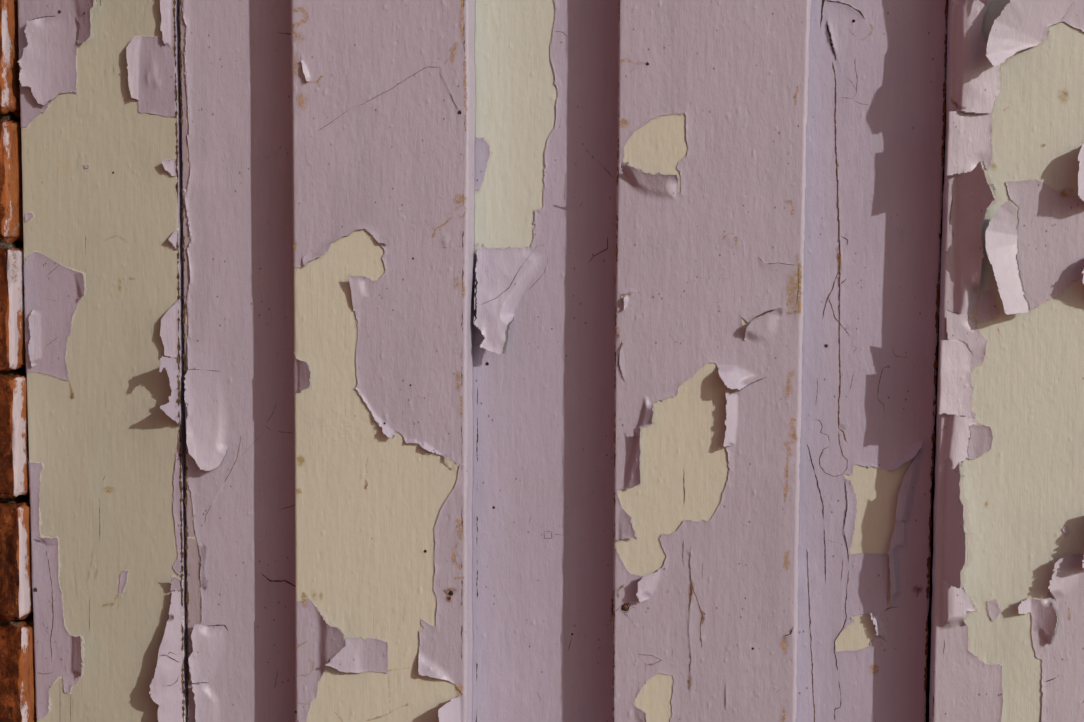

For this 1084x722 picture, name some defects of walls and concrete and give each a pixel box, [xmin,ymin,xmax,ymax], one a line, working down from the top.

peeling [18,0,230,722]
peeling [294,214,463,722]
peeling [473,0,558,354]
peeling [630,674,673,722]
peeling [621,115,687,205]
peeling [615,363,763,603]
crack [748,258,799,323]
crack [785,61,895,722]
peeling [835,613,890,652]
peeling [849,437,925,605]
peeling [937,0,1084,722]